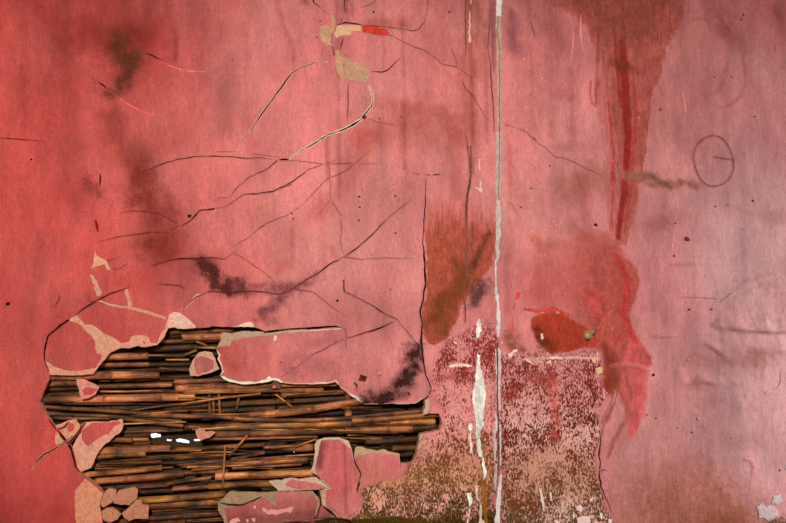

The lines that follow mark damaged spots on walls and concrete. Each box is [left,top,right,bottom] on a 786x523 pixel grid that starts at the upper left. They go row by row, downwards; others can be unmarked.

flaking render [316,15,369,83]
leakage [562,0,700,459]
crack [43,0,605,523]
flaking render [189,322,362,402]
flaking render [394,397,430,415]
flaking render [196,427,216,441]
flaking render [74,479,103,523]
peeling [229,505,293,523]
peeling [572,497,612,523]
peeling [757,493,783,522]